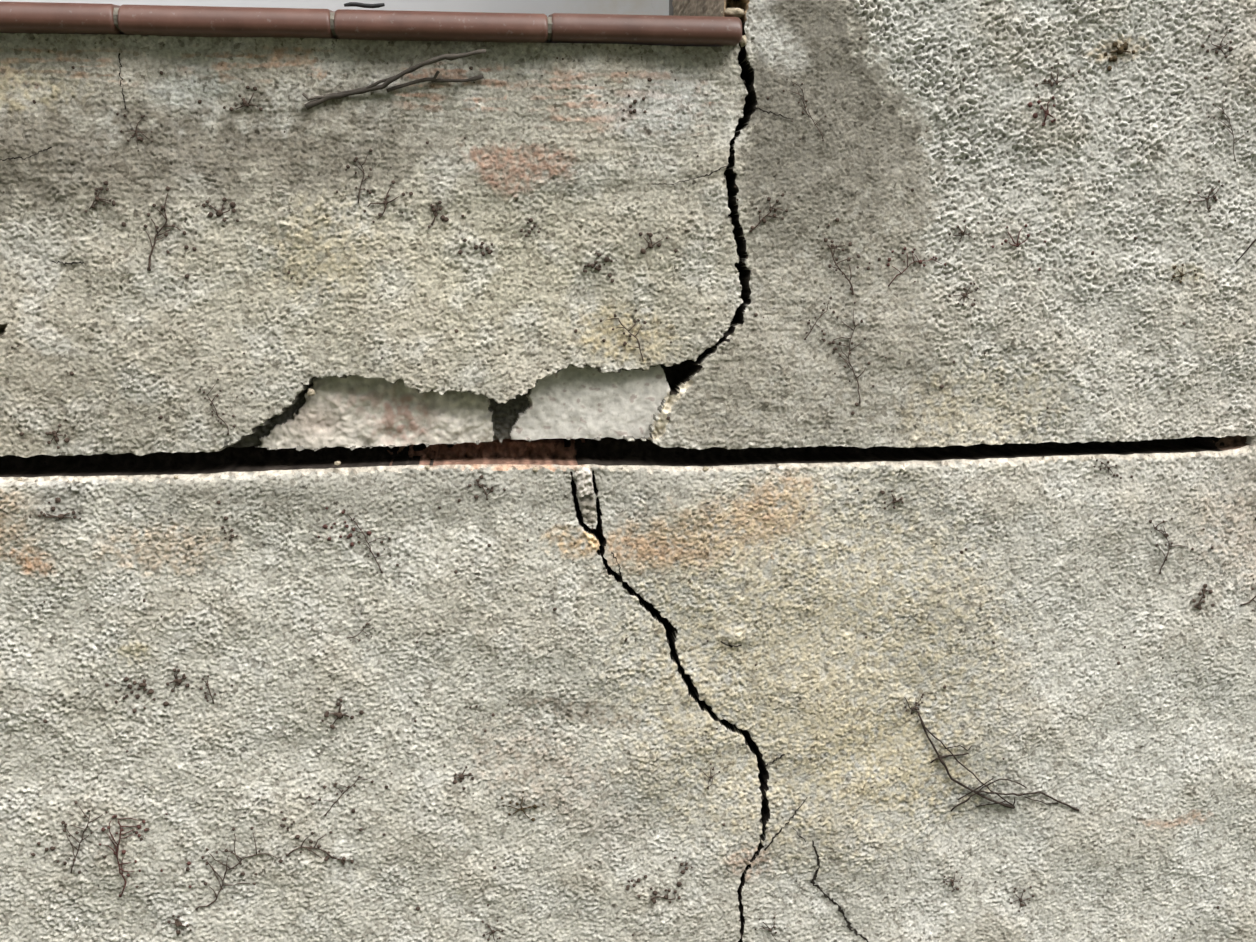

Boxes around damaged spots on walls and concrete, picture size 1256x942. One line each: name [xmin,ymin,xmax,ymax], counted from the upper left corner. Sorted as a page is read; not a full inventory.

crack [118,53,127,109]
crack [0,146,52,161]
crack [652,21,793,395]
spalling [223,364,694,466]
crack [570,470,868,942]